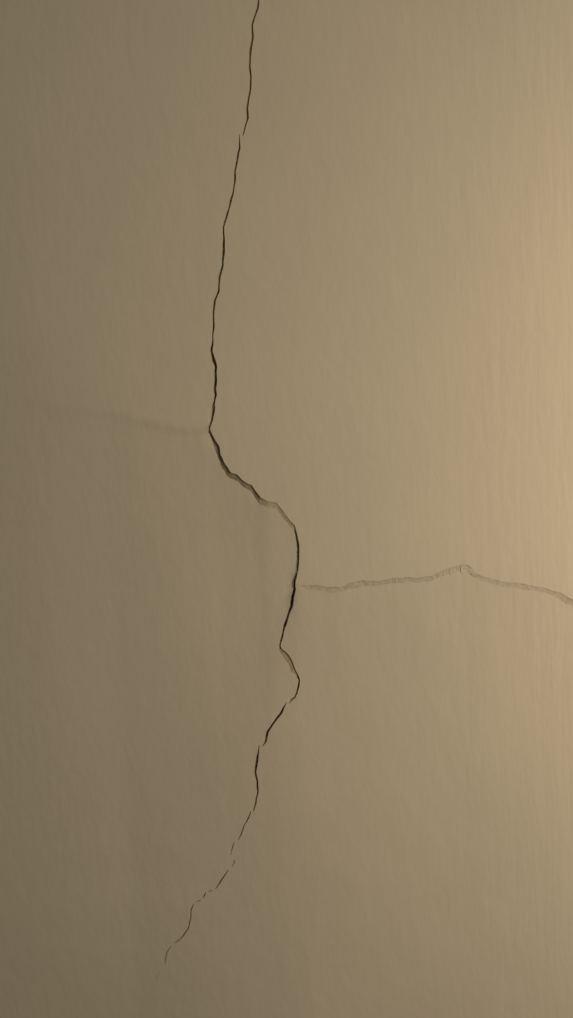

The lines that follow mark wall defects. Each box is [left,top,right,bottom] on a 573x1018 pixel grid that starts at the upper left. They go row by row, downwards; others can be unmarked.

crack [155,0,573,984]